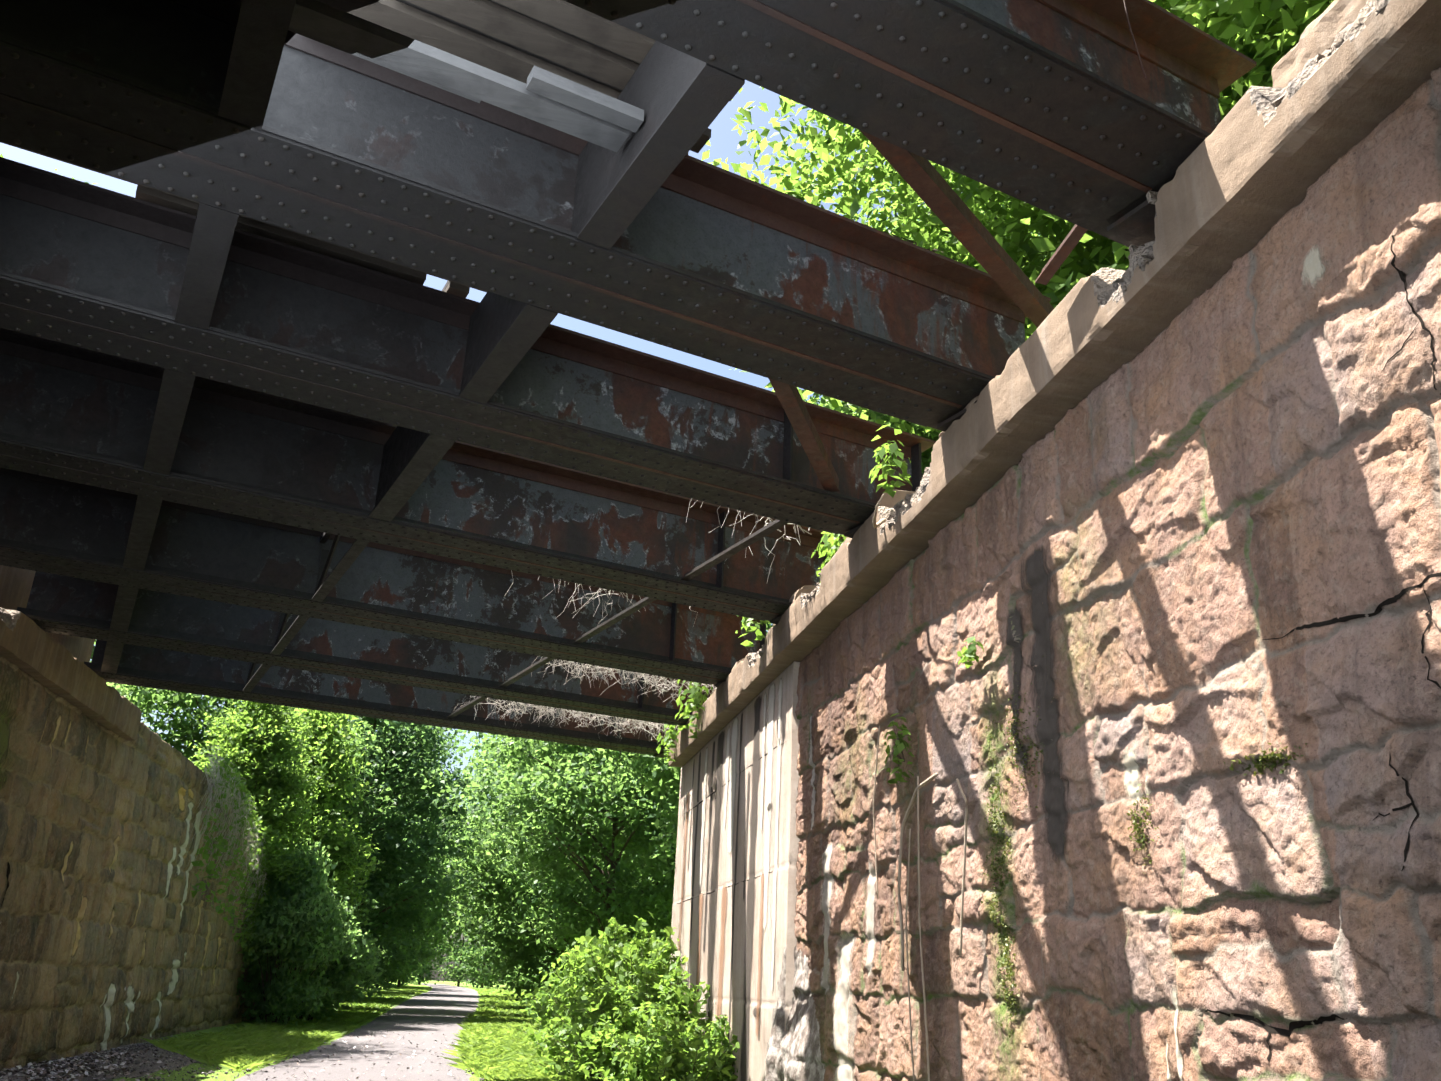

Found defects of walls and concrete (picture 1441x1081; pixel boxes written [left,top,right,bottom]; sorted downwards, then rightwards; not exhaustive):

spalling [1246,0,1391,127]
crack [1383,235,1441,400]
damp [100,802,222,1051]